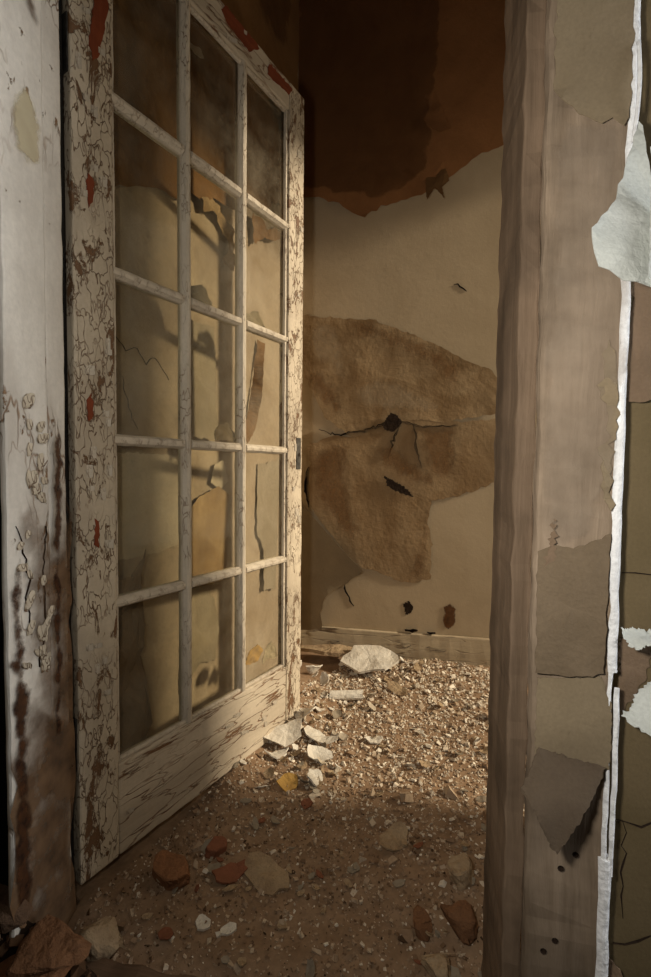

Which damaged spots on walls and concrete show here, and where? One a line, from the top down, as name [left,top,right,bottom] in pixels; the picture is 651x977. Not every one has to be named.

peeling [425,168,449,199]
flaking render [382,413,402,432]
flaking render [384,476,413,497]